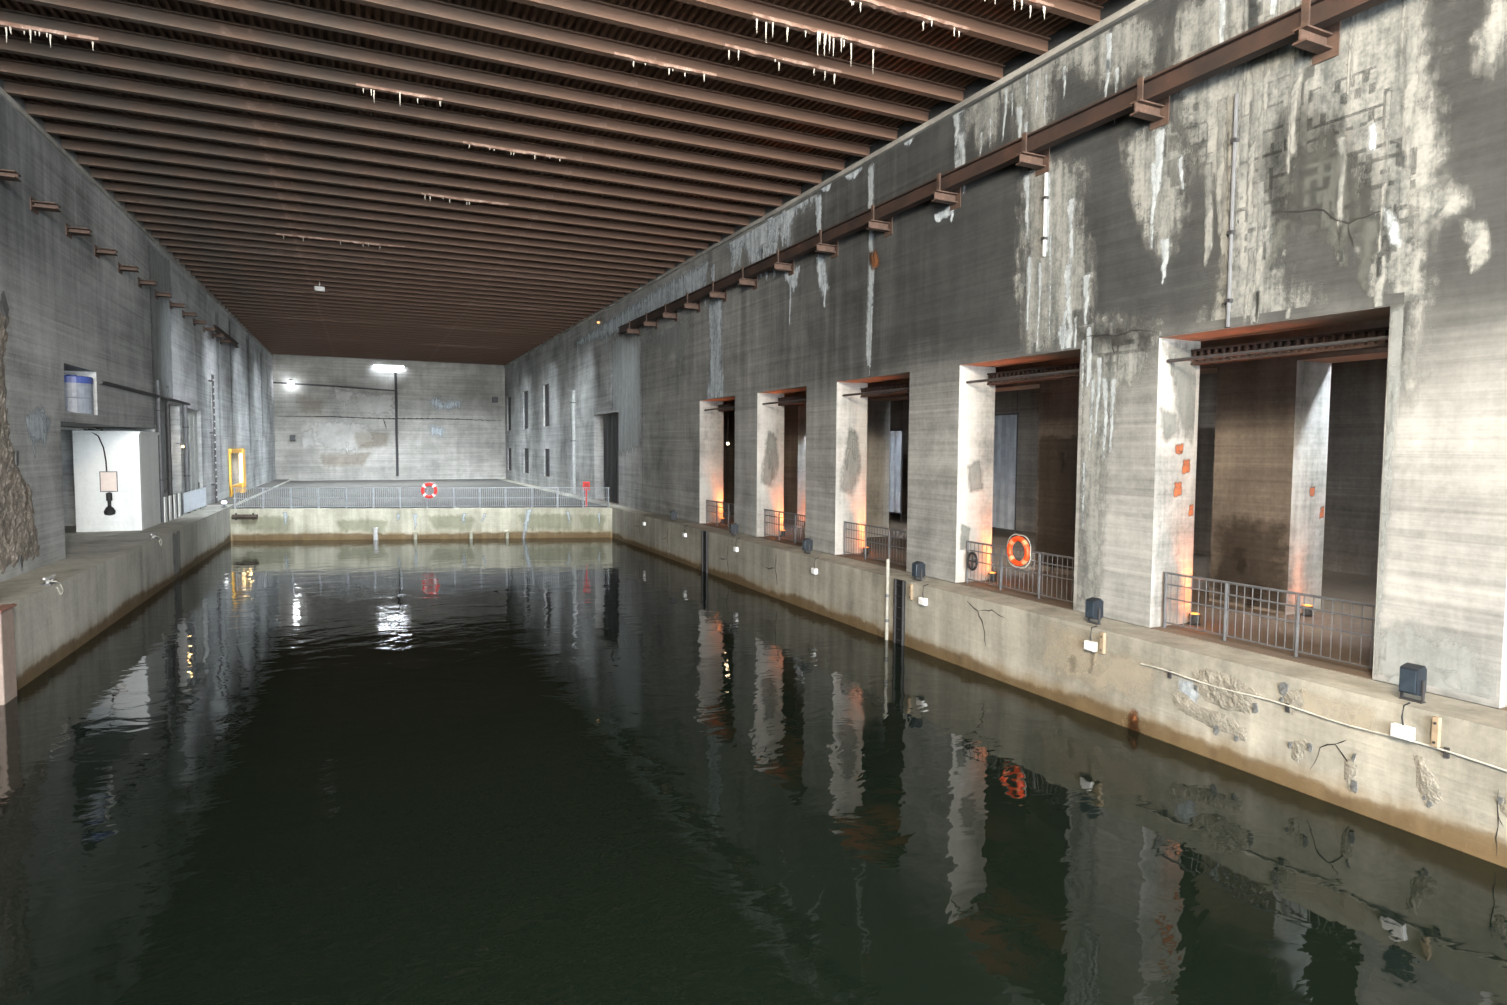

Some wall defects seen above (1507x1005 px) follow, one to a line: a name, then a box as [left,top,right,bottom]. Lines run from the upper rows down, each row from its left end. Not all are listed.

damp [0,20,100,48]
damp [724,12,888,84]
damp [848,0,970,36]
damp [953,0,1302,168]
spalling [0,291,40,574]
damp [1015,160,1162,602]
damp [1126,0,1495,699]
crack [1311,740,1347,768]